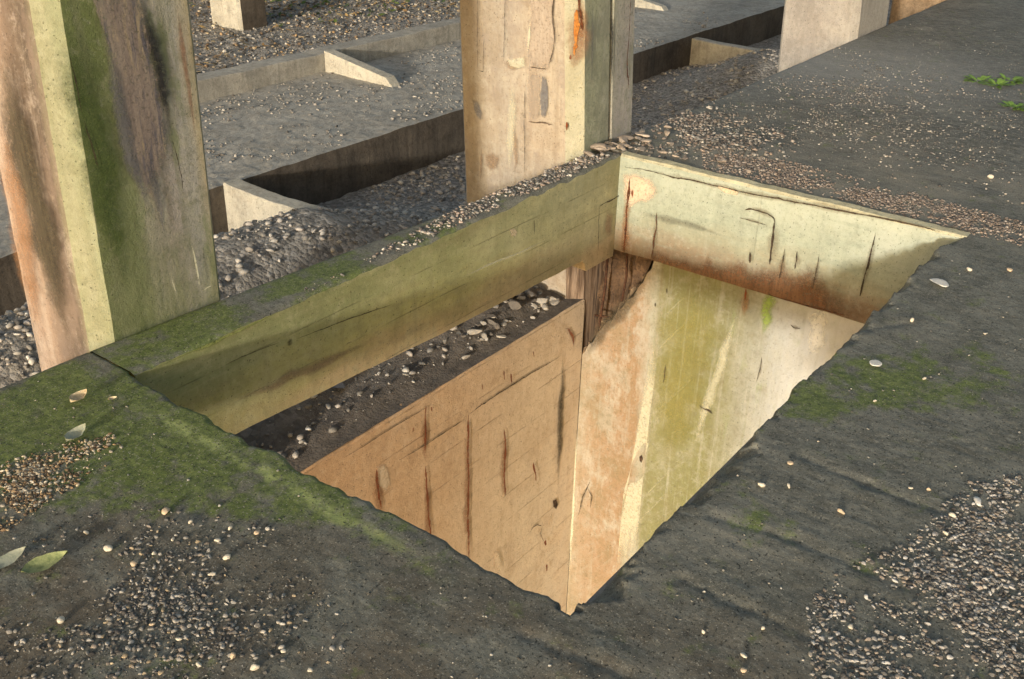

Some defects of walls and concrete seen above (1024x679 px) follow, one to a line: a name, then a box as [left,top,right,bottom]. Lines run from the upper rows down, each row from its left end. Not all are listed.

damp [145,19,169,111]
corrosion [569,0,583,59]
corrosion [624,178,633,248]
crack [633,168,940,295]